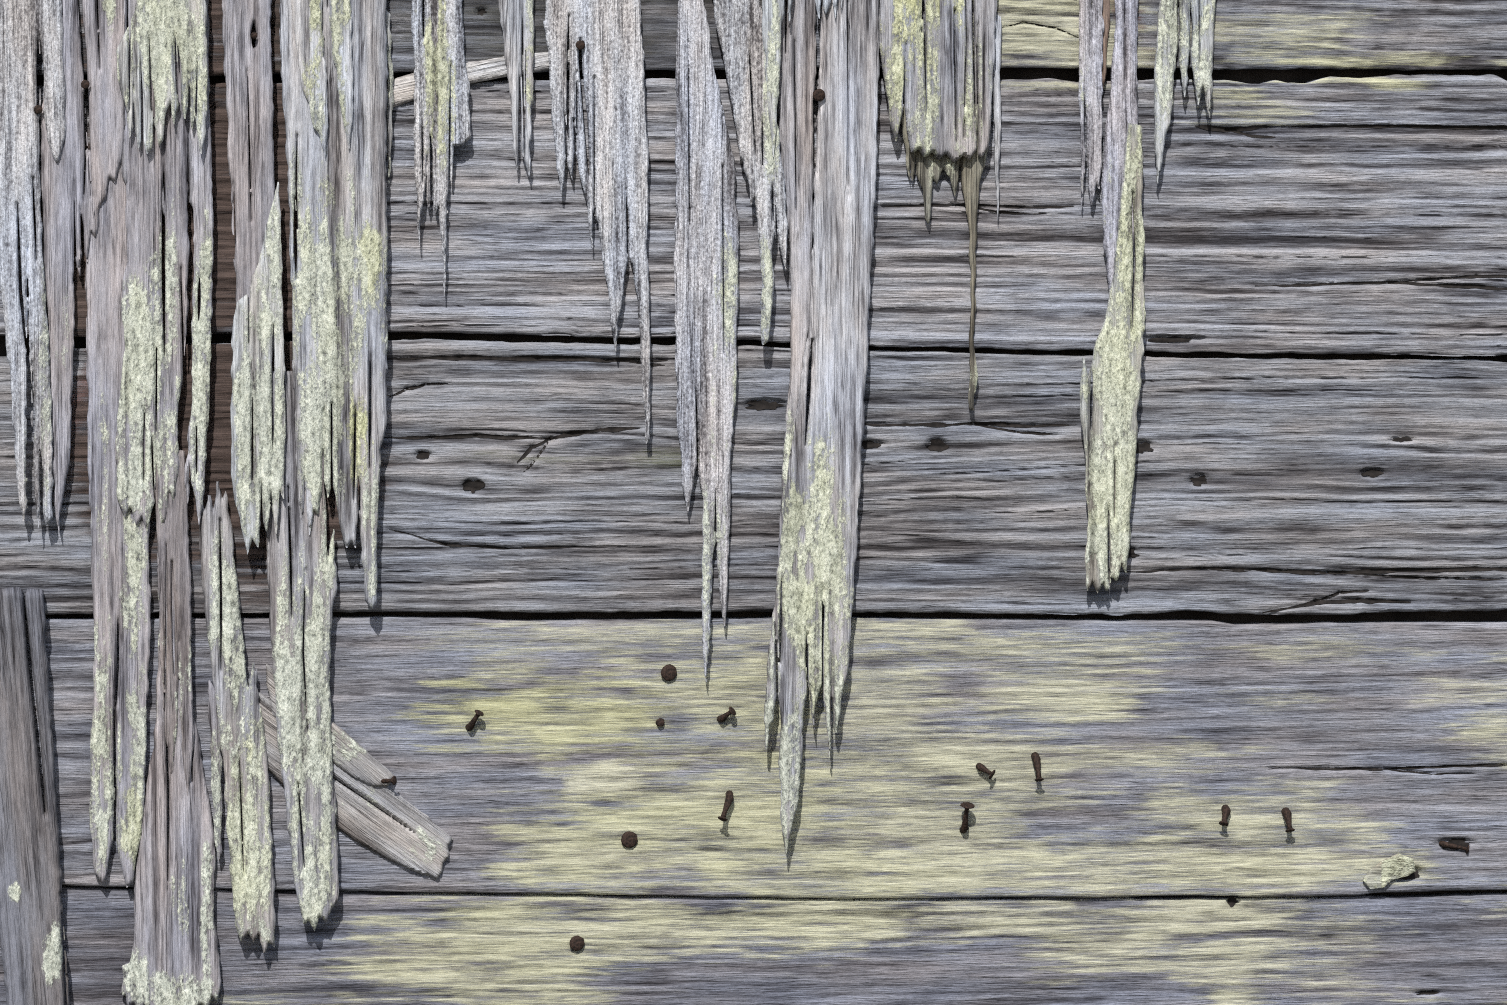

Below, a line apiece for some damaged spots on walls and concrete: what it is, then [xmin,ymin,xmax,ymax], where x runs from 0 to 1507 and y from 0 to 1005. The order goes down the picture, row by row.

crack [1271,764,1507,775]